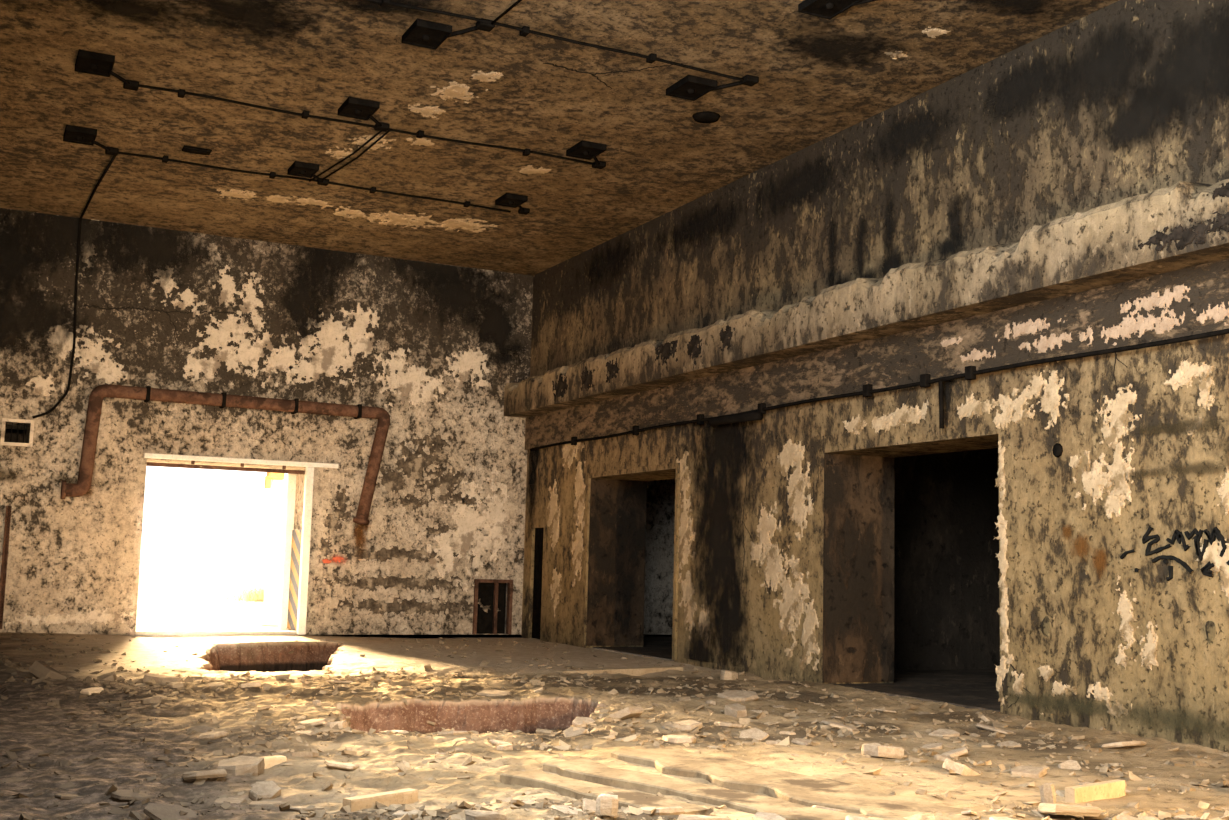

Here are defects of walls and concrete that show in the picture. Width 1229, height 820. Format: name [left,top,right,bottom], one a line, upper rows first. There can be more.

leakage [19,211,208,280]
leakage [828,202,903,286]
leakage [939,195,961,257]
leakage [0,284,84,353]
flaking render [26,325,128,396]
flaking render [152,264,491,409]
flaking render [1164,359,1215,438]
rust [355,517,369,547]
flaking render [378,449,510,616]
leakage [688,428,748,665]
flaking render [750,439,820,672]
flaking render [1195,537,1229,604]